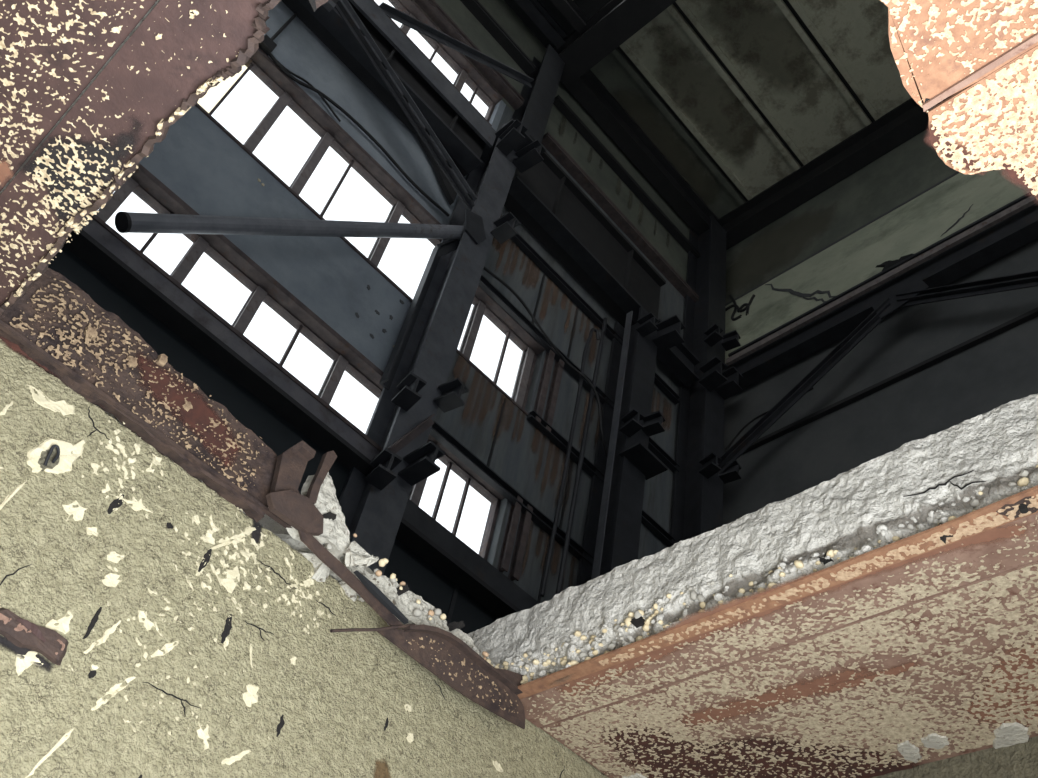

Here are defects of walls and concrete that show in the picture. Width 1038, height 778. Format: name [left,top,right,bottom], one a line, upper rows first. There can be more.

peeling [881,0,1038,195]
rust [926,124,1038,200]
peeling [0,0,263,491]
crack [765,284,835,303]
rust [137,355,240,467]
spalling [62,500,99,536]
crack [903,470,986,497]
spalling [45,610,73,634]
spalling [273,394,1038,778]
rust [556,496,1038,696]
rust [604,661,919,778]
rust [962,644,1038,727]